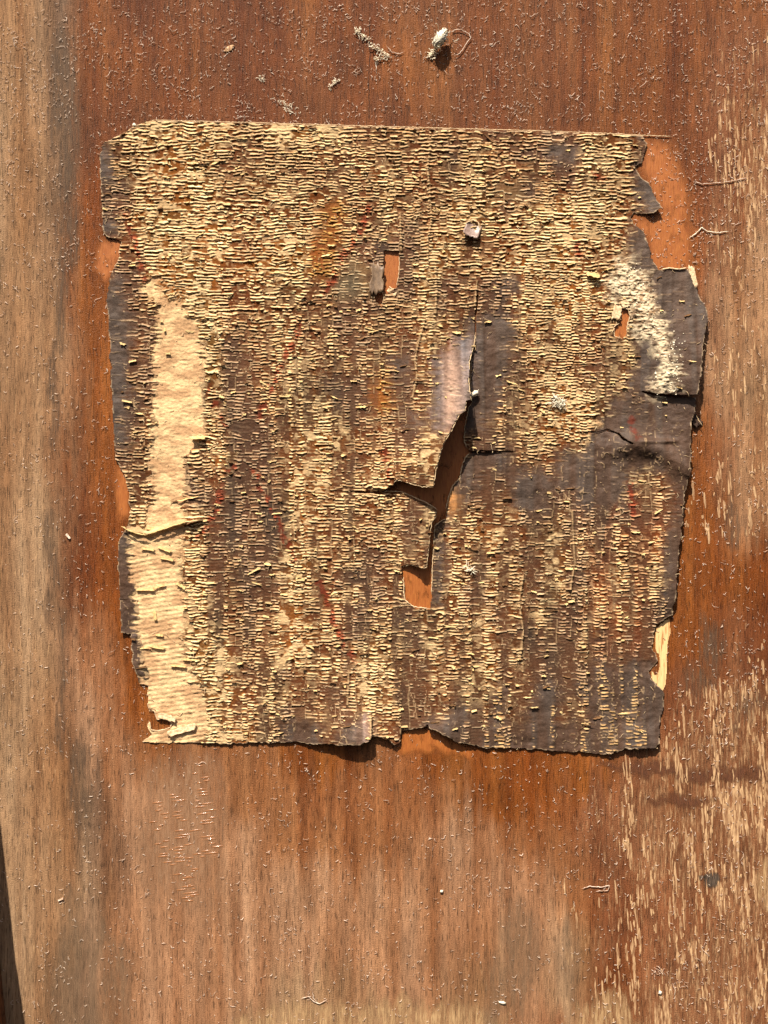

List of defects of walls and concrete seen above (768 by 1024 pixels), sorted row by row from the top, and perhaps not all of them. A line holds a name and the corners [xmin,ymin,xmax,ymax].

peeling [463,207,498,238]
peeling [627,138,691,279]
peeling [95,235,156,281]
peeling [298,238,411,324]
peeling [551,262,632,339]
crack [578,430,627,442]
peeling [115,273,303,744]
crack [385,480,436,509]
peeling [374,416,497,610]
peeling [468,638,550,708]
peeling [380,715,473,759]